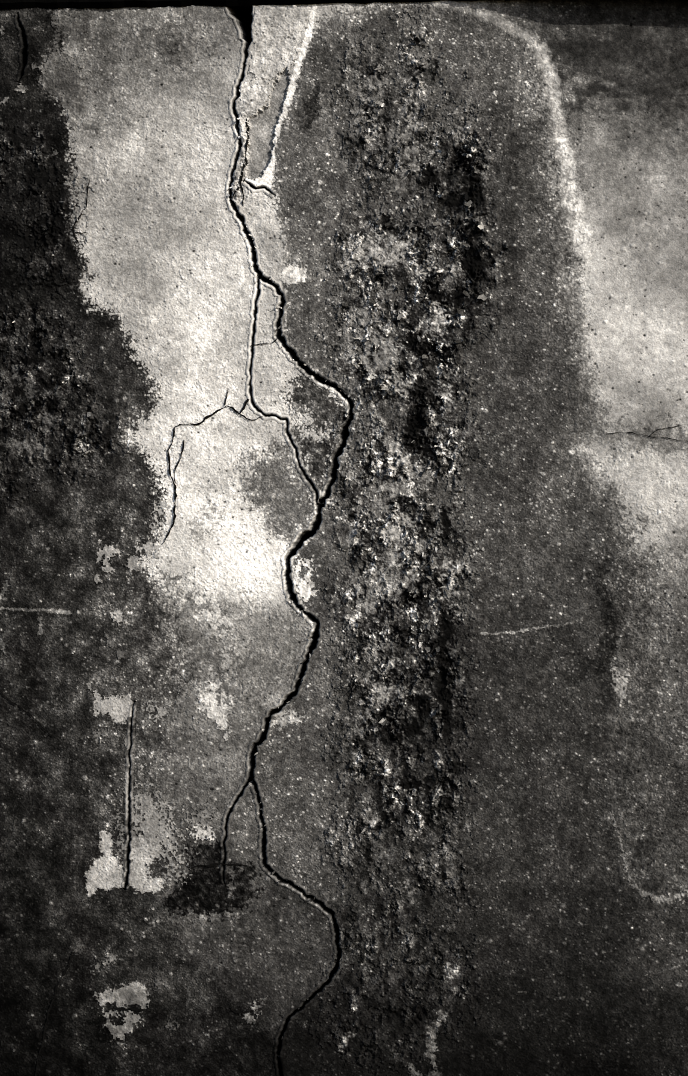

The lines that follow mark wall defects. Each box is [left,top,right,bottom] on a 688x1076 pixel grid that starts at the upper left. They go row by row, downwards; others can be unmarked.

crack [14,12,31,82]
water stain [0,8,98,207]
water stain [121,19,232,71]
crack [162,5,357,1076]
water stain [245,0,688,1076]
water stain [0,196,317,1076]
crack [121,701,137,889]
peeling [83,775,223,899]
peeling [90,951,121,975]
peeling [93,966,167,1048]